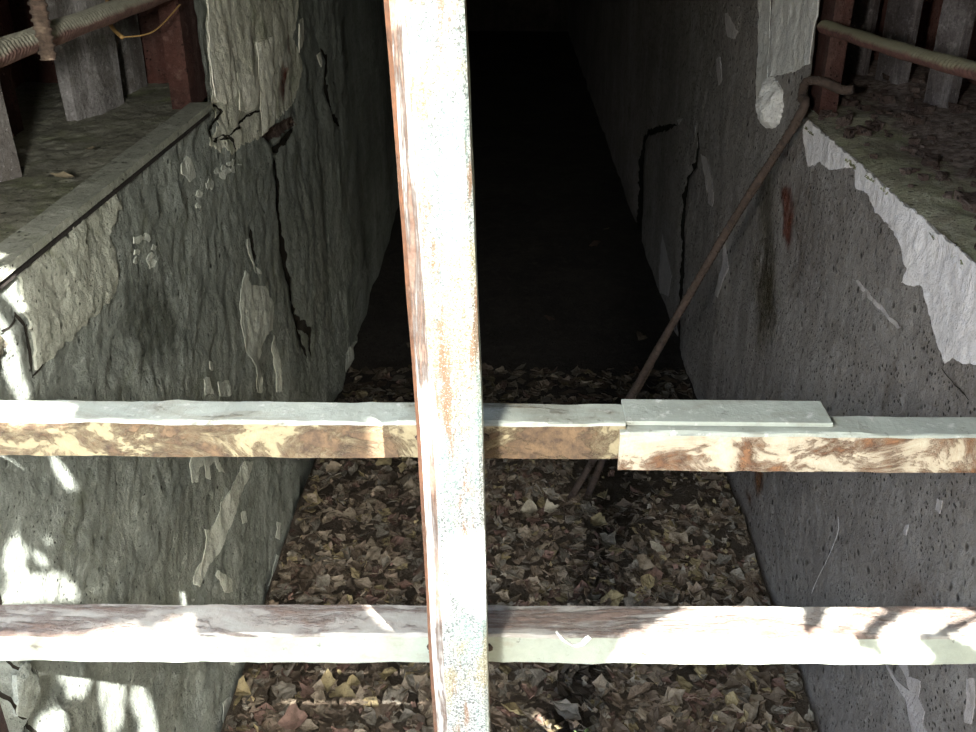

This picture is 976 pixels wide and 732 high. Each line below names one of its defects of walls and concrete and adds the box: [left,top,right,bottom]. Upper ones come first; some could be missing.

peeling [756,0,819,102]
crack [208,104,259,165]
crack [248,228,256,266]
crack [272,128,311,359]
crack [636,124,699,340]
peeling [803,120,976,365]
peeling [239,238,282,393]
peeling [189,456,225,483]
peeling [193,460,253,593]
peeling [885,664,927,732]